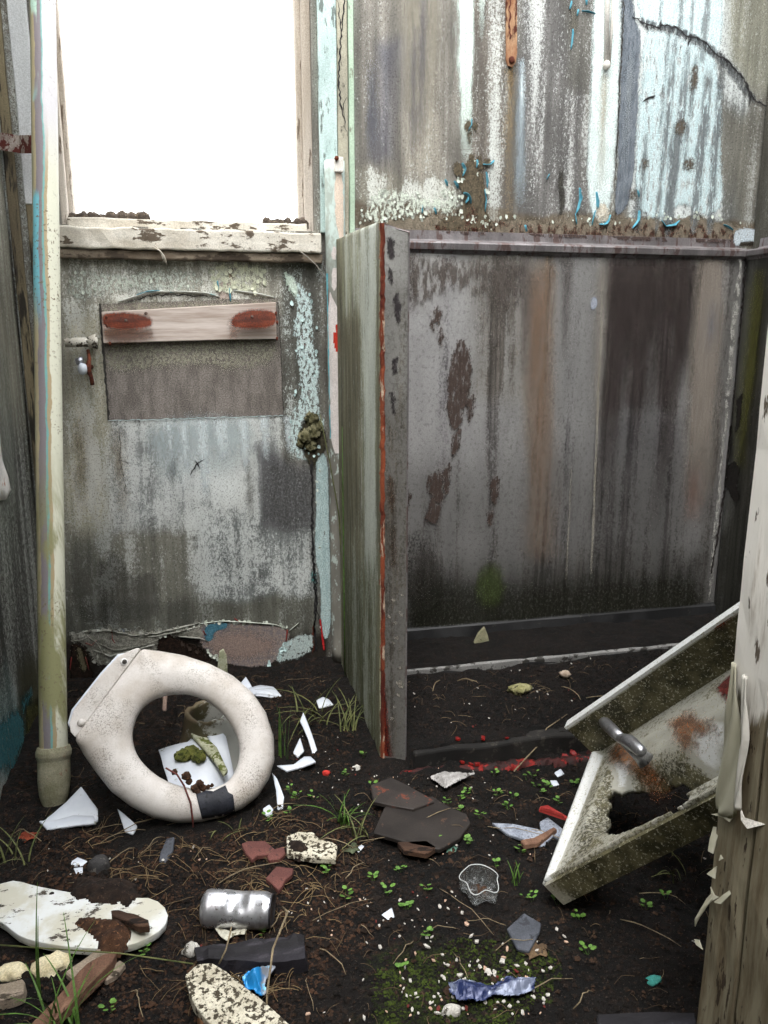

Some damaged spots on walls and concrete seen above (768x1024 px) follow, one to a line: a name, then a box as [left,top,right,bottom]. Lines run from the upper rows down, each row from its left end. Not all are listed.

crack [632,17,767,107]
leakage [158,418,269,478]
spalling [69,30,755,678]
corrosion [410,257,526,526]
leakage [591,258,747,600]